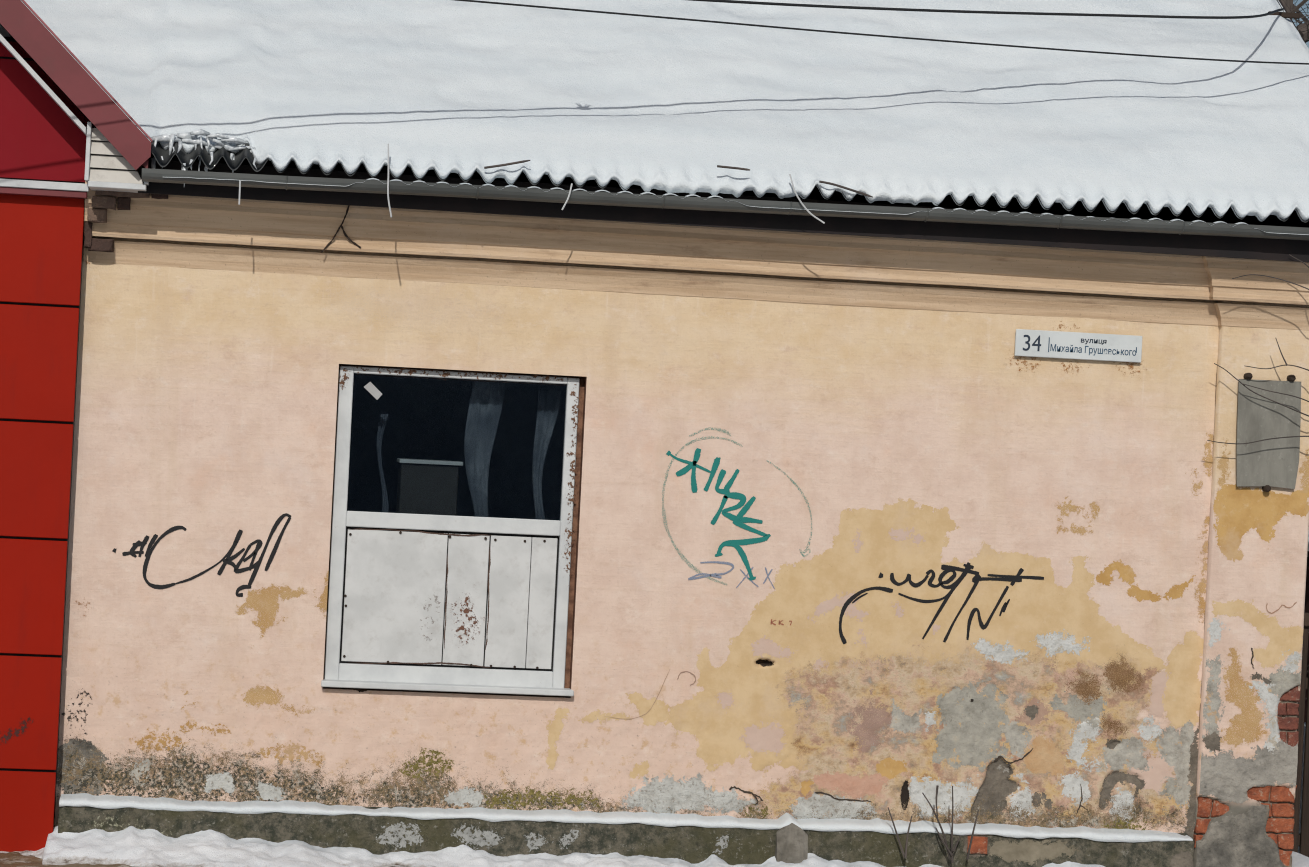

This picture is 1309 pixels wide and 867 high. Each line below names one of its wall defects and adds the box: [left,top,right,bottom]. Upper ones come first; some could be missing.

peeling [1185,432,1309,562]
peeling [236,581,316,649]
rust [348,528,491,668]
peeling [242,682,315,716]
peeling [546,496,1304,867]
damp [56,723,1194,833]